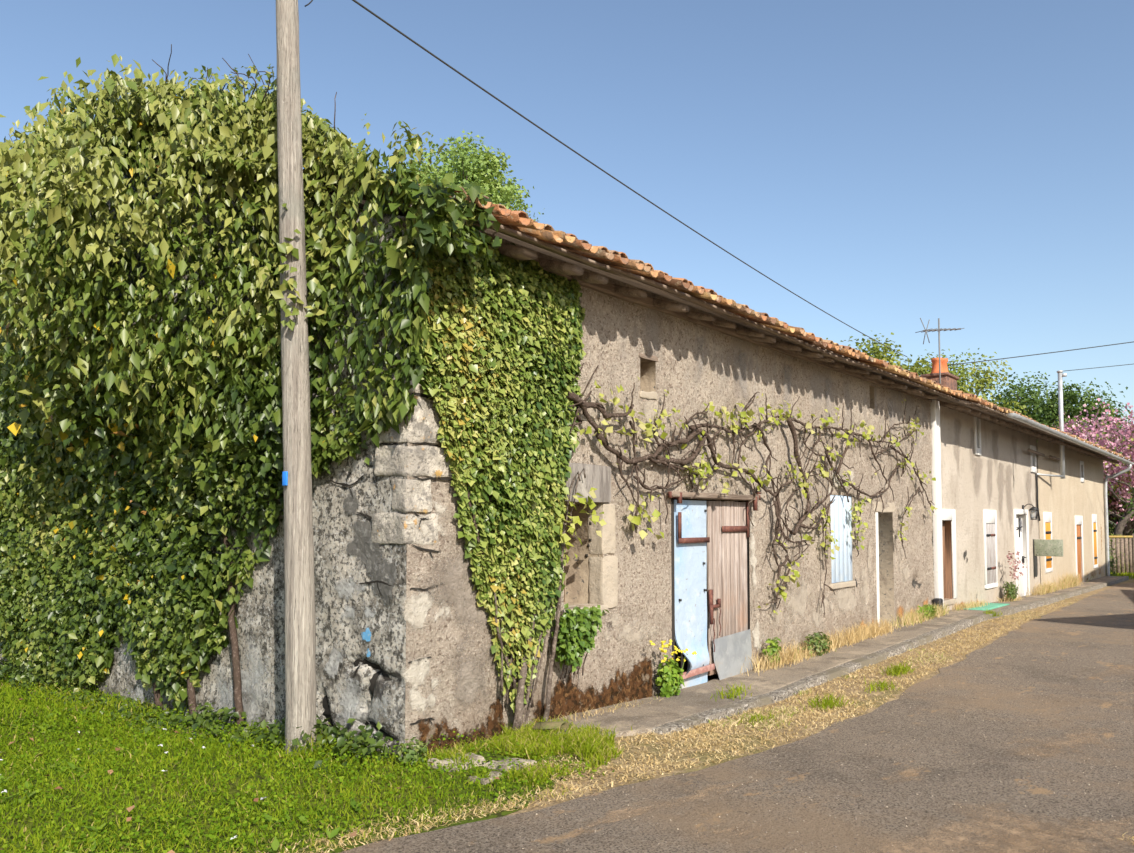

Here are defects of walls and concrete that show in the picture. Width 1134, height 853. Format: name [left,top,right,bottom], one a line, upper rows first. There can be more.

crack [323,695,334,727]
crack [351,656,435,741]